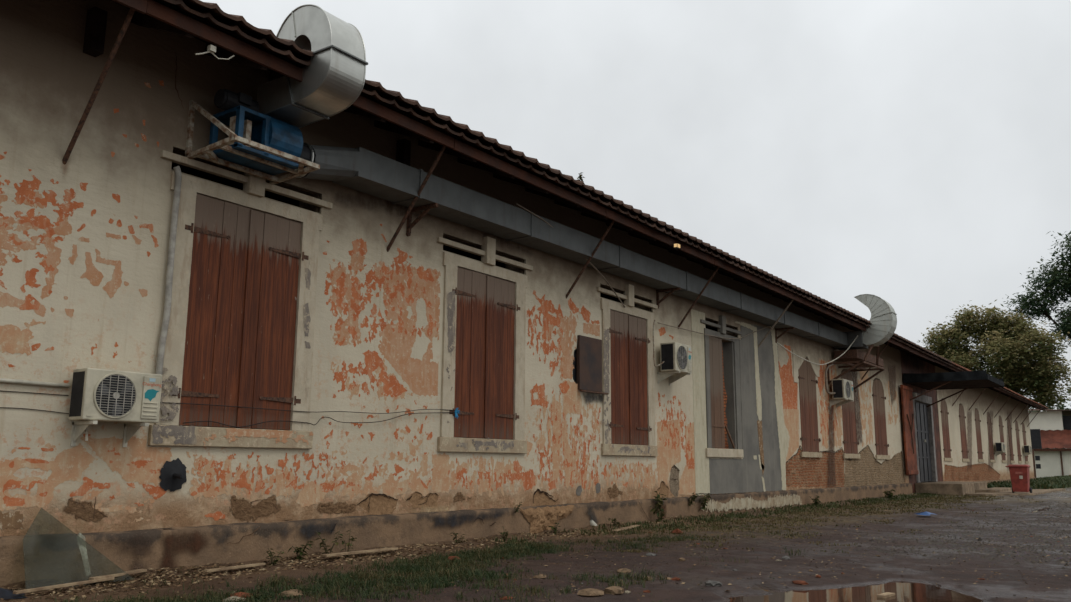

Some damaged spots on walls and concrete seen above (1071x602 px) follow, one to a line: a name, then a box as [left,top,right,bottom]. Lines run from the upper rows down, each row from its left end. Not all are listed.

peeling [0,169,148,367]
peeling [106,216,159,257]
peeling [0,224,696,534]
flaking render [779,344,905,488]